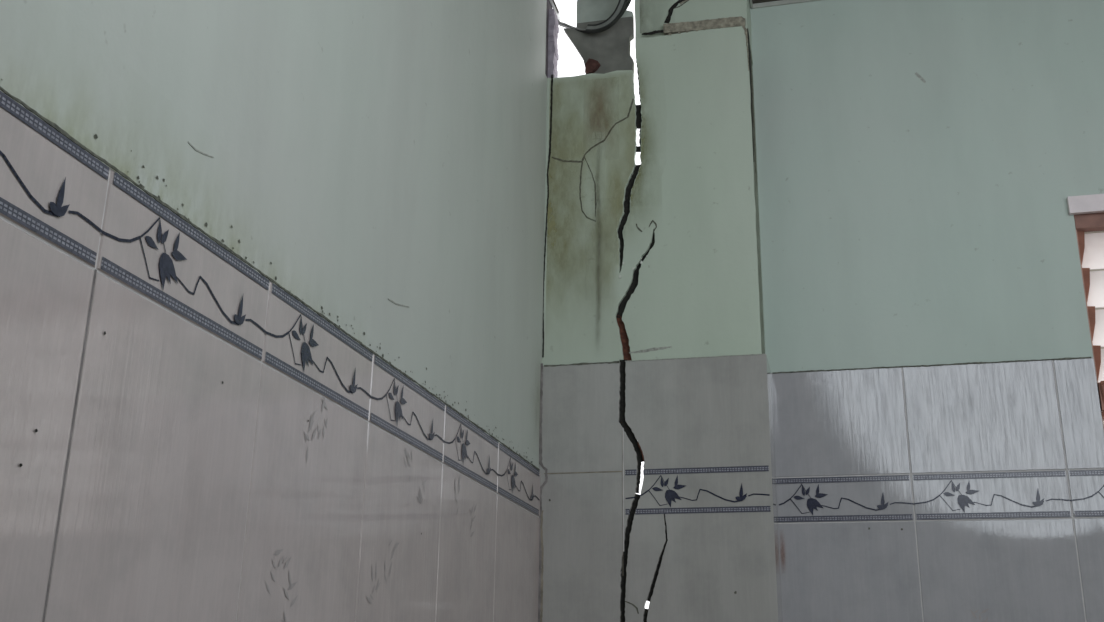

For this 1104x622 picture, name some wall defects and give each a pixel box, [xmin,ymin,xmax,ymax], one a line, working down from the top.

water stain [0,79,540,471]
crack [538,64,672,622]
water stain [615,117,646,211]
crack [642,0,689,35]